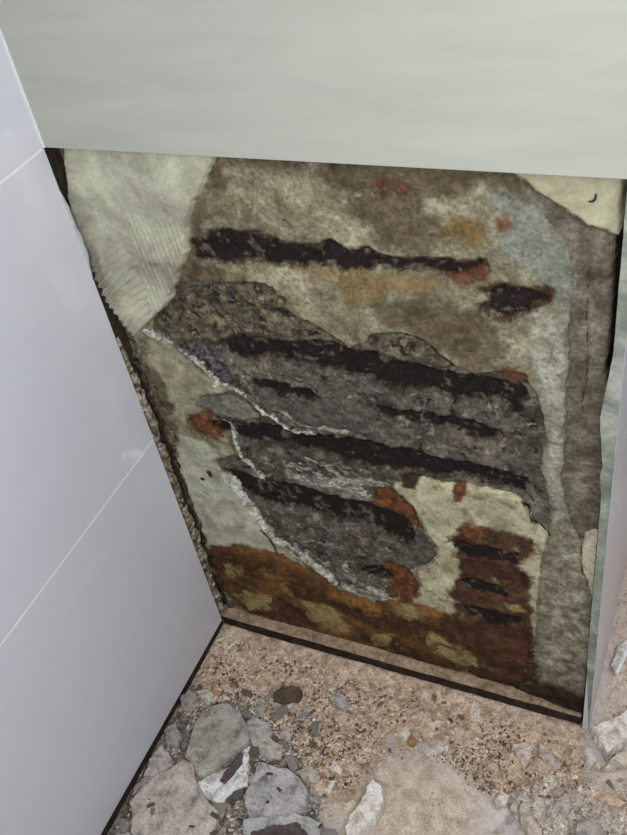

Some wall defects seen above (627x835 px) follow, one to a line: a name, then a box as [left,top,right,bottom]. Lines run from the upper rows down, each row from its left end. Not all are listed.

rust [190,227,491,288]
rust [186,411,528,546]
rust [220,334,529,414]
spalling [133,173,618,698]
rust [376,405,505,440]
rust [209,522,538,685]